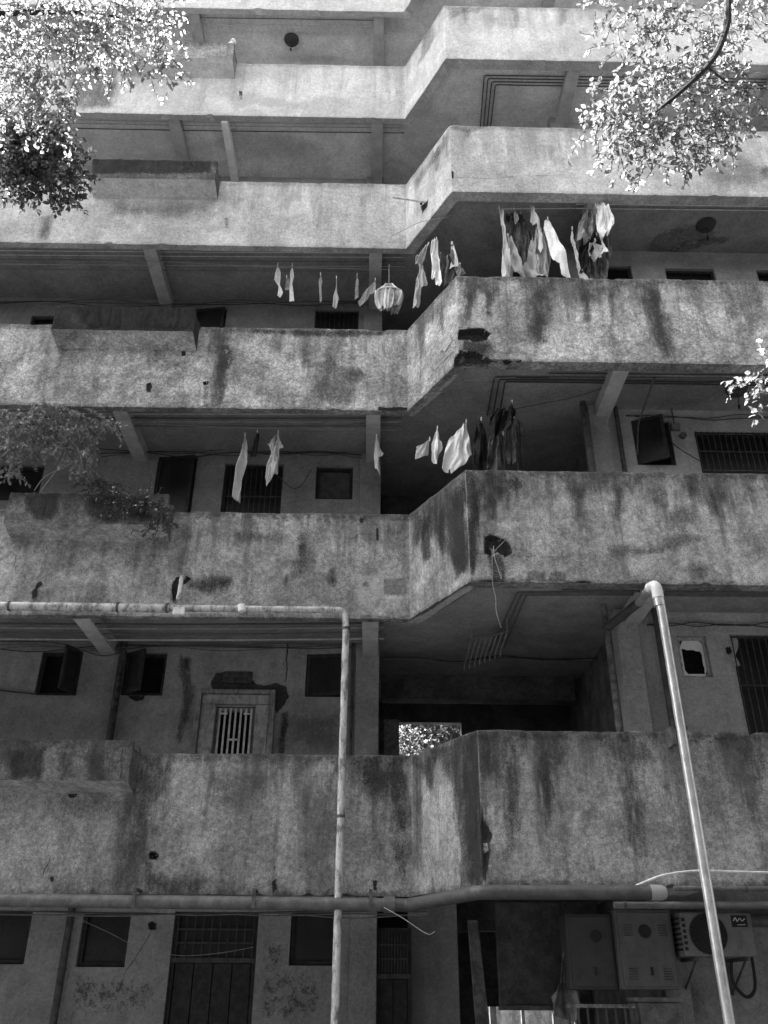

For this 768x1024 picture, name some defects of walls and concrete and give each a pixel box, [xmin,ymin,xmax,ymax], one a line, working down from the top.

damp [204,331,229,408]
damp [253,329,384,337]
damp [459,277,498,322]
spalling [453,328,522,367]
damp [528,282,556,343]
damp [576,280,674,358]
damp [85,495,153,522]
damp [411,470,522,577]
damp [194,576,233,593]
spalling [407,535,512,623]
peeling [211,672,289,713]
damp [353,731,565,888]